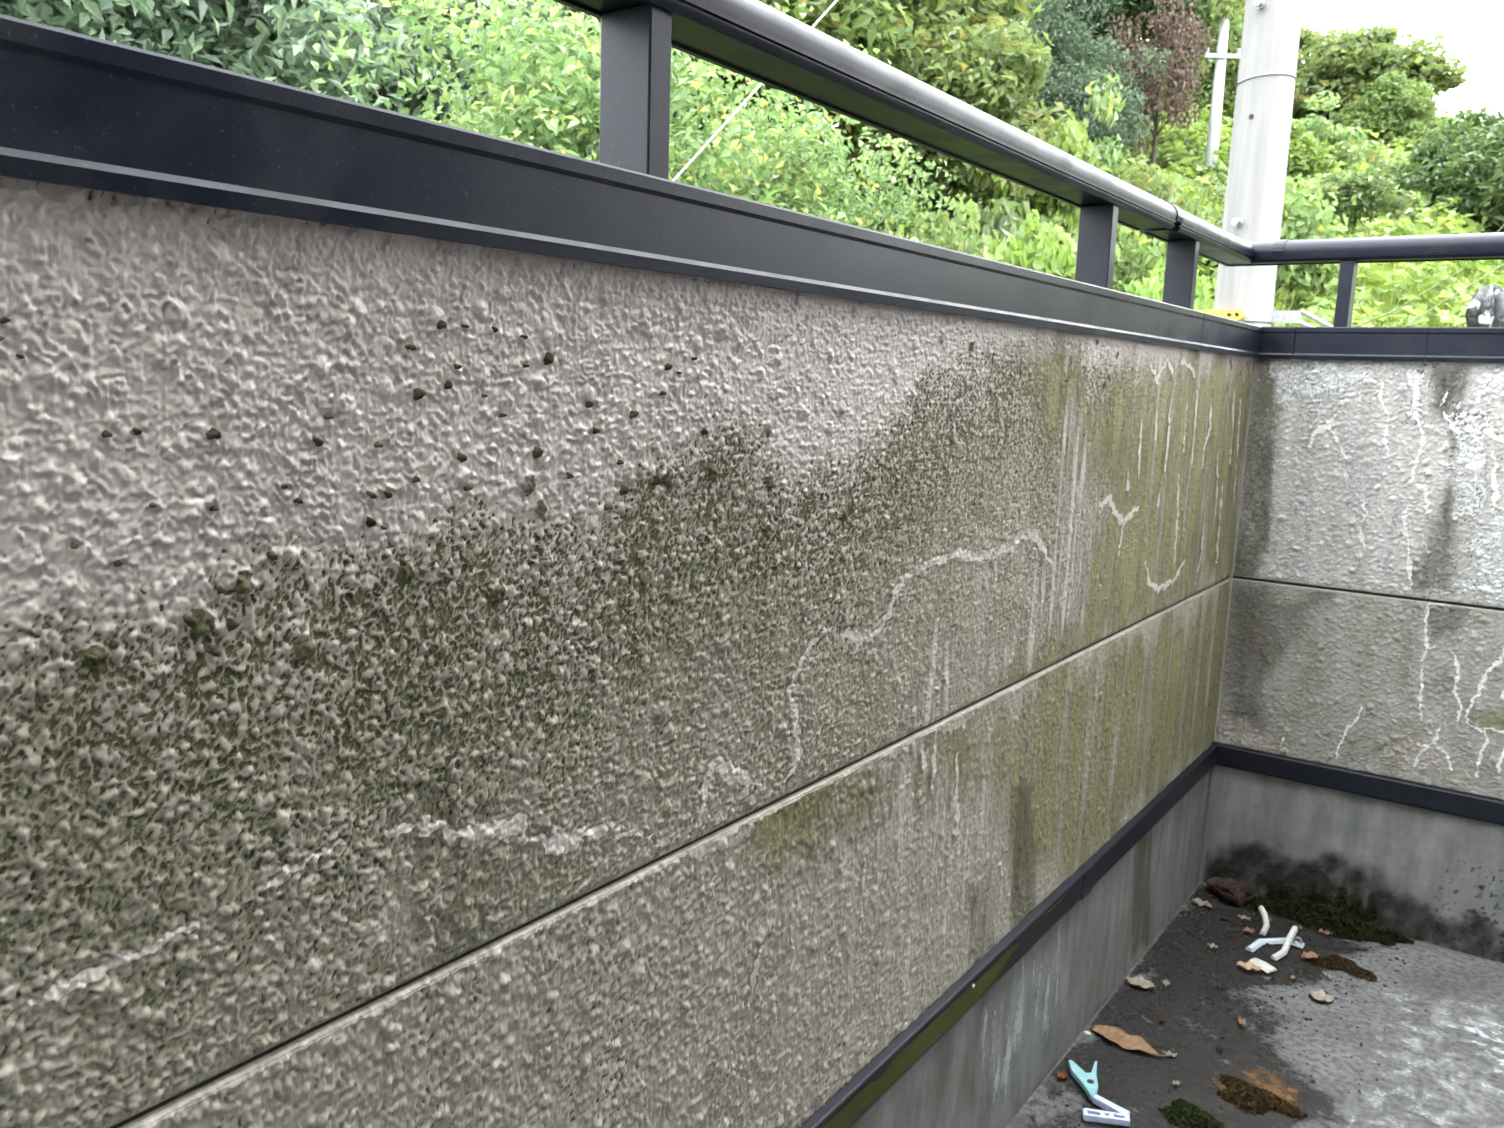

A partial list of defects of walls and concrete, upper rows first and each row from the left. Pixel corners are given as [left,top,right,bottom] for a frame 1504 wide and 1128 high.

water stain [1334,361,1501,575]
crack [1307,370,1504,778]
water stain [1405,453,1504,764]
crack [383,527,1053,857]
crack [28,920,201,1007]
crack [263,839,346,891]
water stain [586,962,646,1128]
crack [708,871,718,912]
crack [747,921,797,1014]
water stain [980,931,1061,1102]
water stain [1203,844,1504,963]